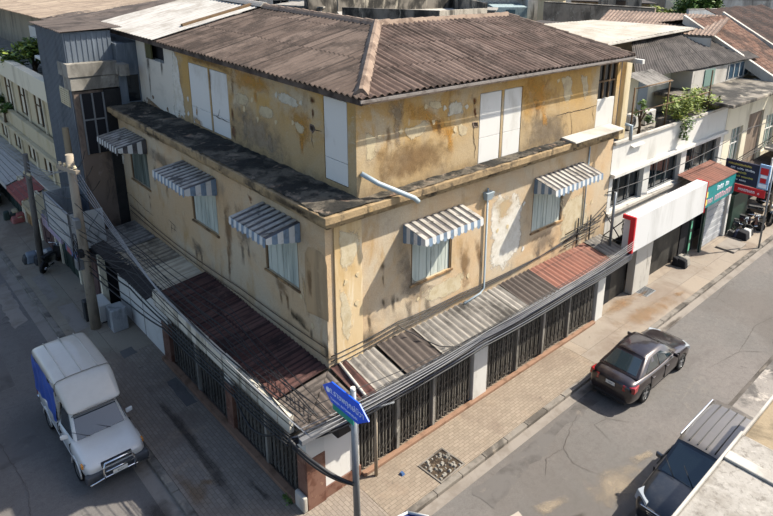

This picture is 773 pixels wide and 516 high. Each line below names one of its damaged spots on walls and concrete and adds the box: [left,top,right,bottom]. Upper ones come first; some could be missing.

peeling [399,120,435,140]
peeling [496,198,512,233]
peeling [339,231,360,285]